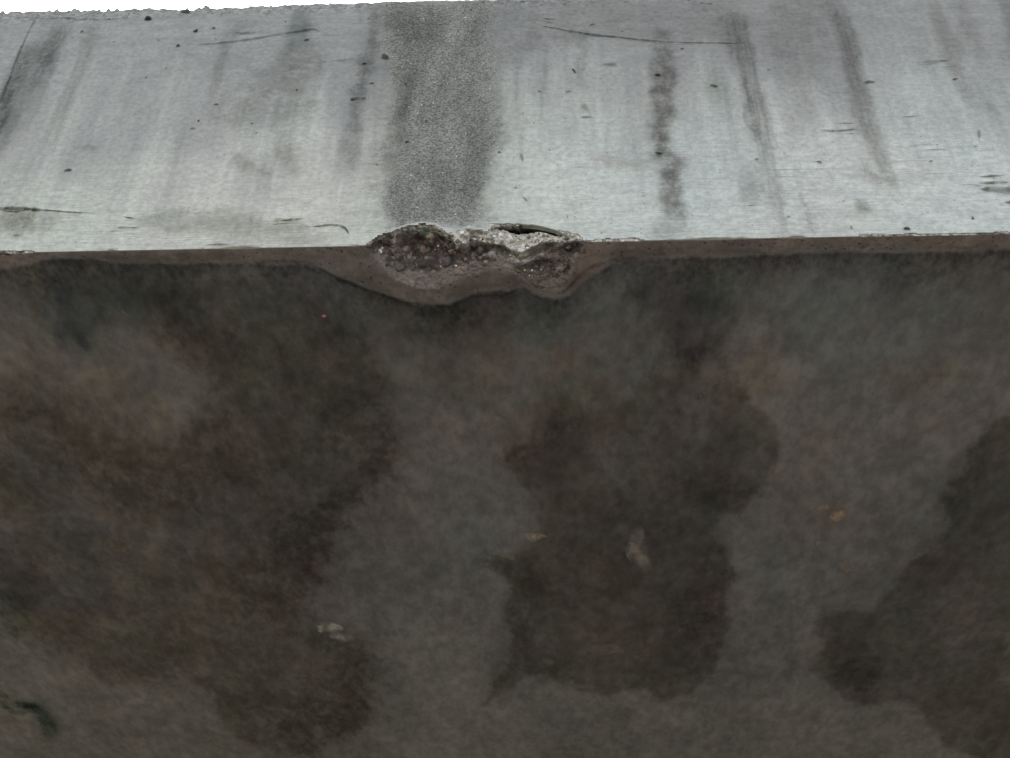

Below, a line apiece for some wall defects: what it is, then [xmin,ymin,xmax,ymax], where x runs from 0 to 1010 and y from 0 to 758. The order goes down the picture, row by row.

crack [3,206,86,214]
spalling [350,0,644,292]